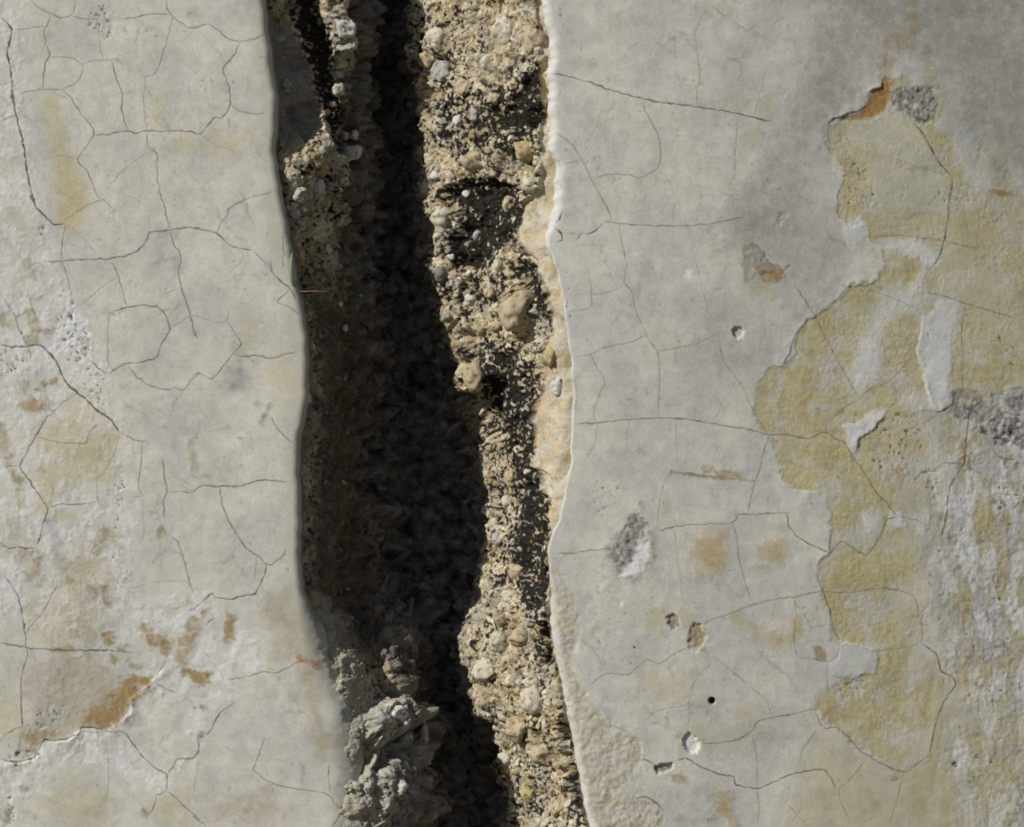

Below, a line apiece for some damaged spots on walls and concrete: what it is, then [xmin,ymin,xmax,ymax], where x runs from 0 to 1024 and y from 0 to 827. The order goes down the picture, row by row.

crack [0,0,301,413]
crack [0,290,290,612]
spalling [541,0,675,827]
crack [252,0,1019,827]
peeling [745,90,1024,783]
rust [19,721,66,754]
crack [0,576,236,827]
rust [81,670,159,737]
crack [205,653,306,680]